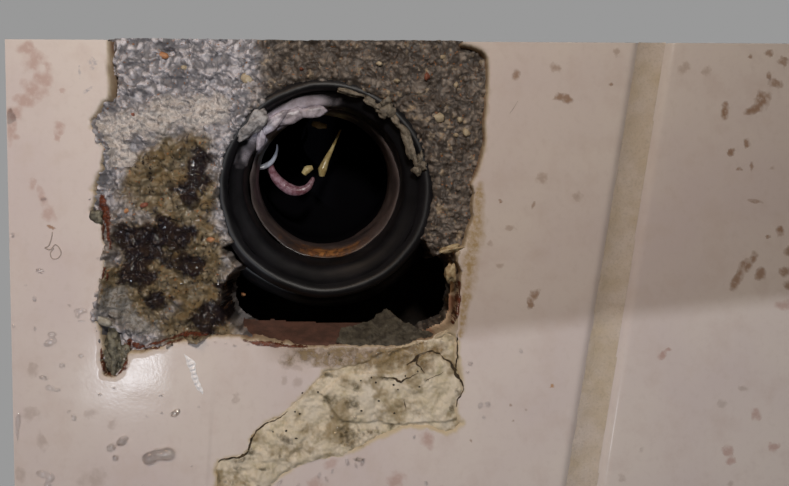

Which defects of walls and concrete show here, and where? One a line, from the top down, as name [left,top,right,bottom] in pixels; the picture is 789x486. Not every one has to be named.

leakage [742,70,784,116]
leakage [169,142,216,206]
rust [98,195,112,250]
leakage [99,213,205,335]
leakage [189,279,236,335]
spalling [89,38,486,486]
rust [451,280,461,324]
leakage [728,250,767,293]
leakage [765,226,789,312]
rust [100,331,218,377]
rust [243,339,308,348]
crack [383,334,464,407]